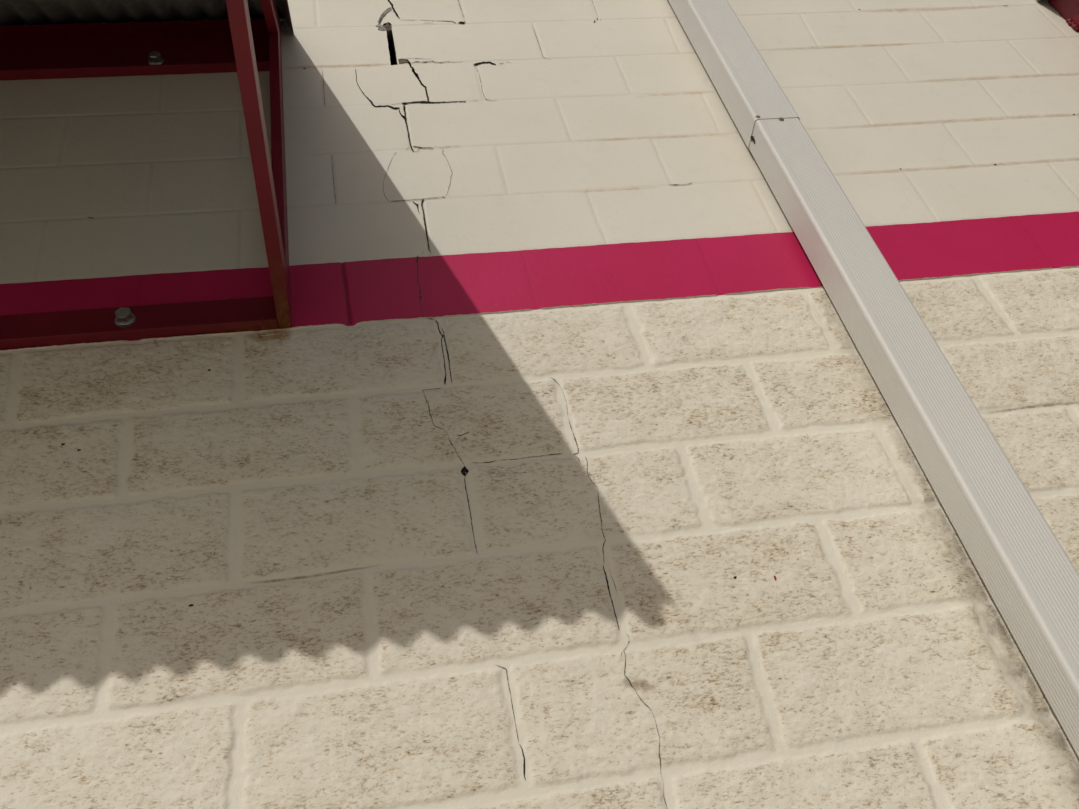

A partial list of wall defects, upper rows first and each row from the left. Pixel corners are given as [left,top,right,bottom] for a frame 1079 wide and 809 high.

crack [378,0,400,24]
crack [355,58,667,806]